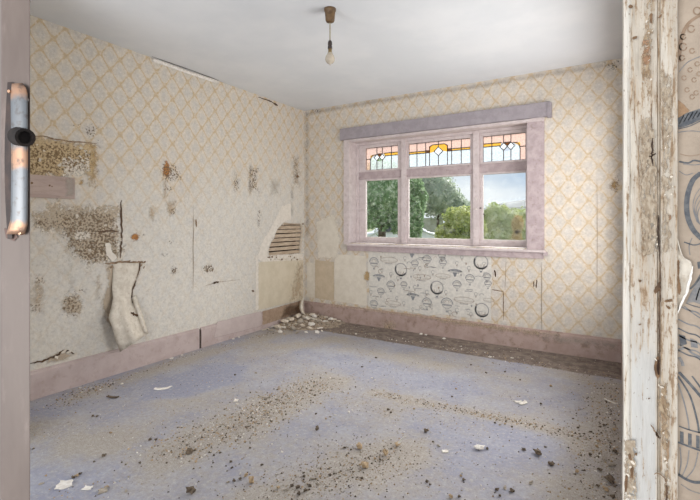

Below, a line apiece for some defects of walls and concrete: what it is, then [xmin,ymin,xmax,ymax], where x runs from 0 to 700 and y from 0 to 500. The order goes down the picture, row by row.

peeling [641,0,653,96]
flaking render [30,137,97,180]
rust [163,161,181,191]
flaking render [639,71,673,256]
flaking render [31,203,125,324]
crack [117,200,125,258]
flaking render [214,223,304,338]
flaking render [624,440,637,500]
peeling [651,356,670,500]